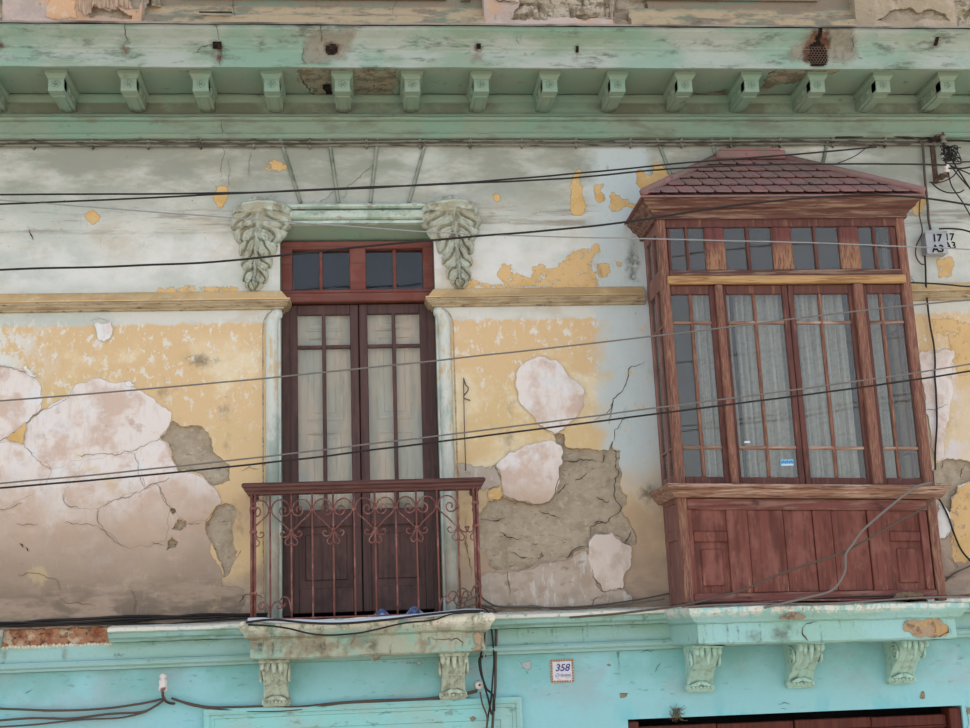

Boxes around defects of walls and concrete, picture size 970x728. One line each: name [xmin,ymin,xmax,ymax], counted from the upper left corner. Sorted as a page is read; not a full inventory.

peeling [45,0,132,20]
flaking render [297,68,399,94]
peeling [463,244,622,289]
peeling [457,356,585,504]
crack [609,361,645,439]
peeling [919,316,970,461]
peeling [0,366,245,650]
peeling [937,482,970,578]
peeling [481,533,633,611]
spalling [779,606,823,620]
flaking render [903,618,949,638]